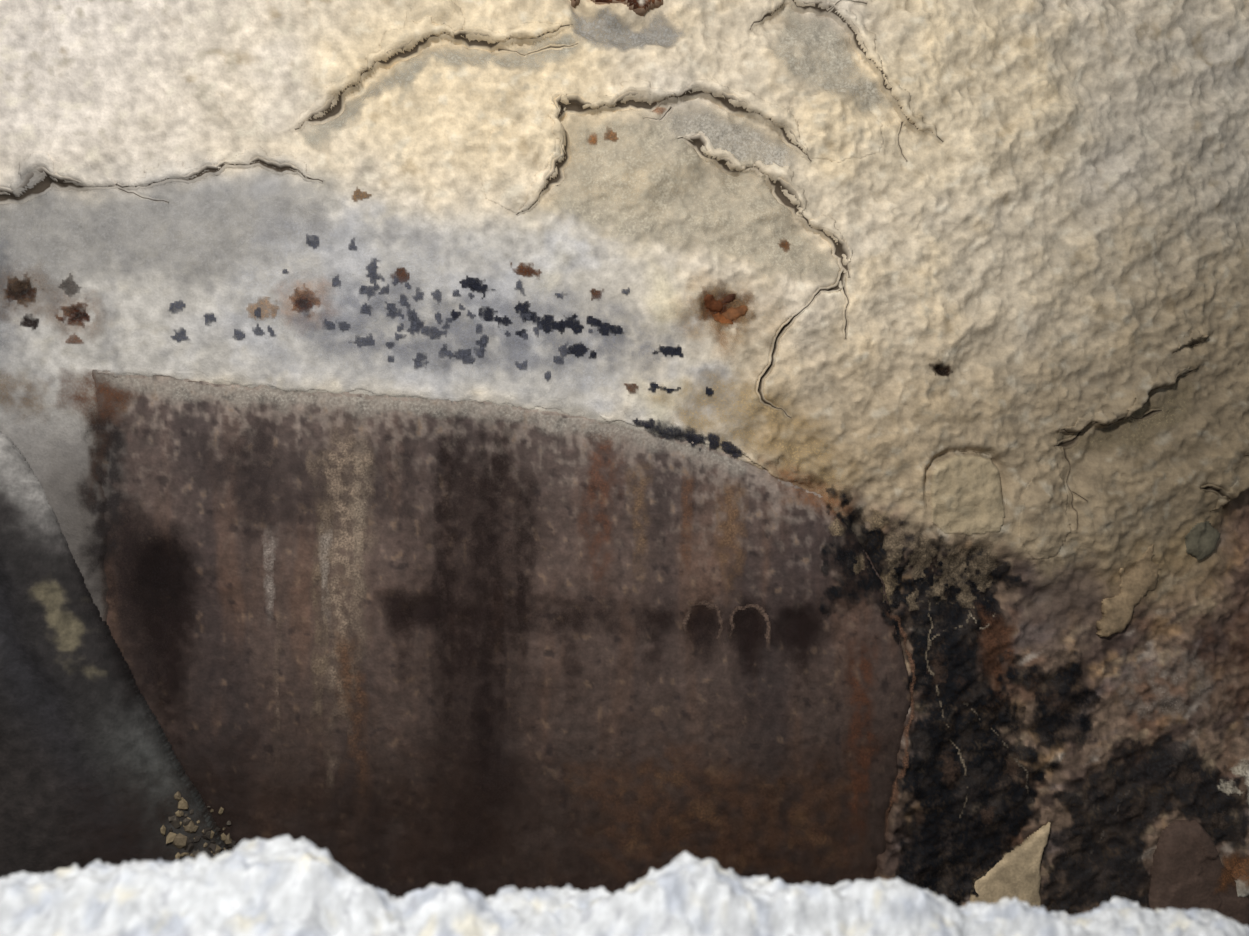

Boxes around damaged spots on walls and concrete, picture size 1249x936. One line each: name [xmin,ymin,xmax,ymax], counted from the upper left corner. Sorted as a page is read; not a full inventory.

crack [294,23,578,132]
spalling [299,10,681,142]
corrosion [5,275,37,307]
corrosion [56,303,89,344]
spalling [0,145,315,291]
crack [0,157,323,204]
mould [233,307,275,340]
mould [322,258,623,381]
mould [641,345,684,357]
crack [515,86,851,419]
spalling [518,77,853,275]
corrosion [698,288,753,328]